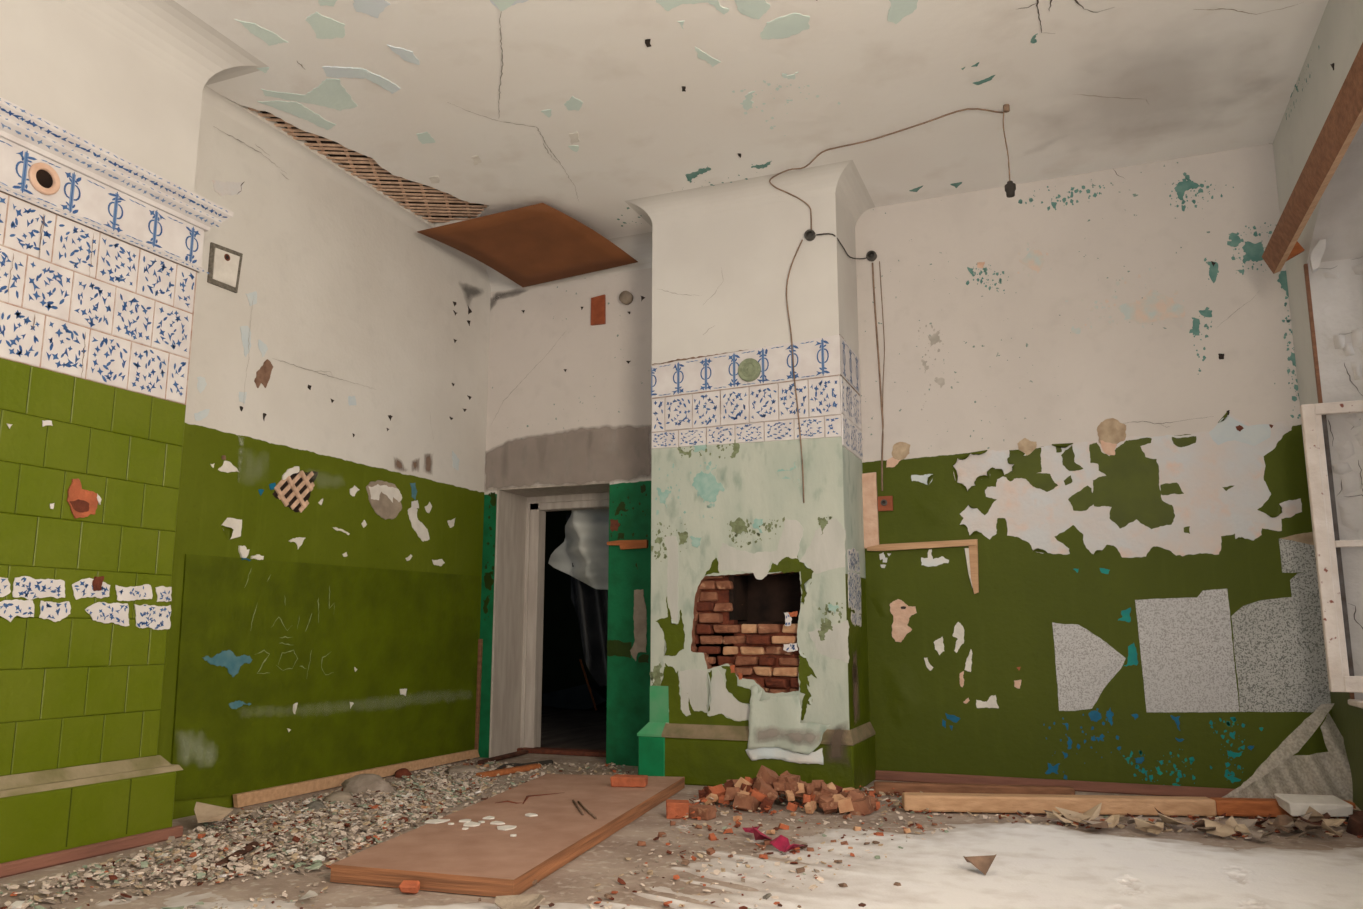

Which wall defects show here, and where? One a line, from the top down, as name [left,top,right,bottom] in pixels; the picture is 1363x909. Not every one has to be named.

peeling [656,0,810,39]
crack [1019,0,1114,34]
peeling [1169,172,1234,211]
peeling [918,325,945,411]
spalling [886,442,910,468]
peeling [911,474,934,485]
peeling [952,222,1331,786]
peeling [921,549,949,567]
peeling [0,576,172,630]
peeling [607,440,861,765]
spalling [890,599,917,642]
peeling [924,622,999,730]